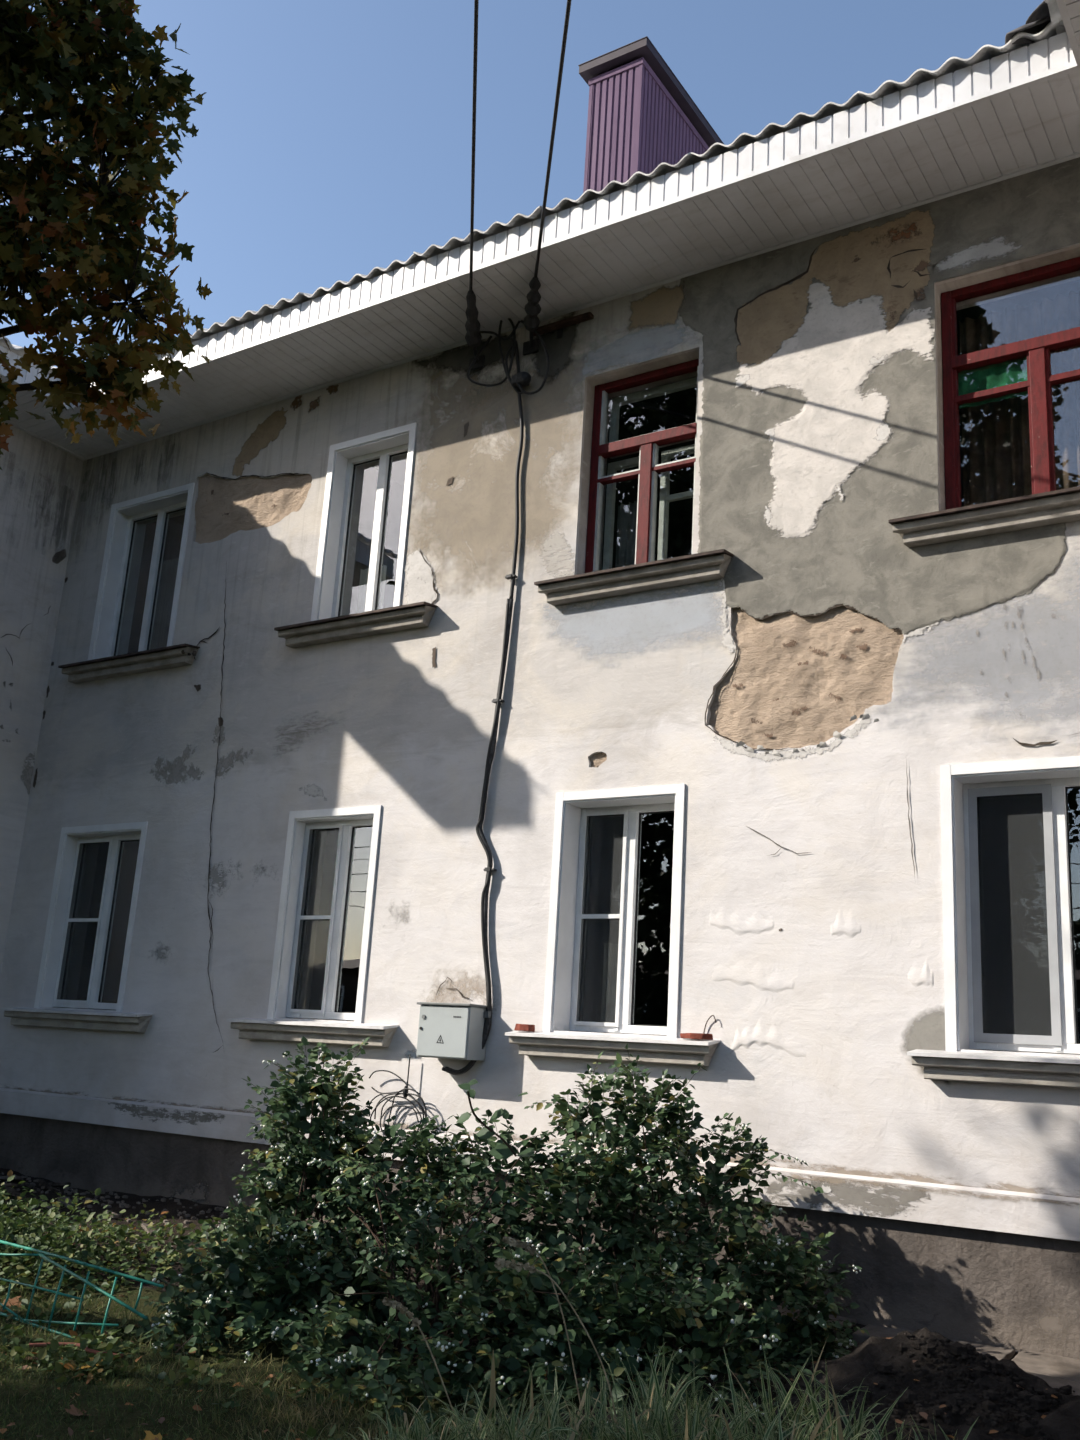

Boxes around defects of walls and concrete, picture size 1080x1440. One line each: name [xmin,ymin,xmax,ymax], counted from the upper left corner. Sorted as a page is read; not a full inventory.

peeling [628,285,684,330]
peeling [734,210,935,366]
flaking render [195,384,339,544]
flaking render [705,578,939,761]
crack [194,562,227,1053]
flaking render [590,753,607,768]
peeling [108,1102,224,1125]
peeling [764,1176,931,1217]